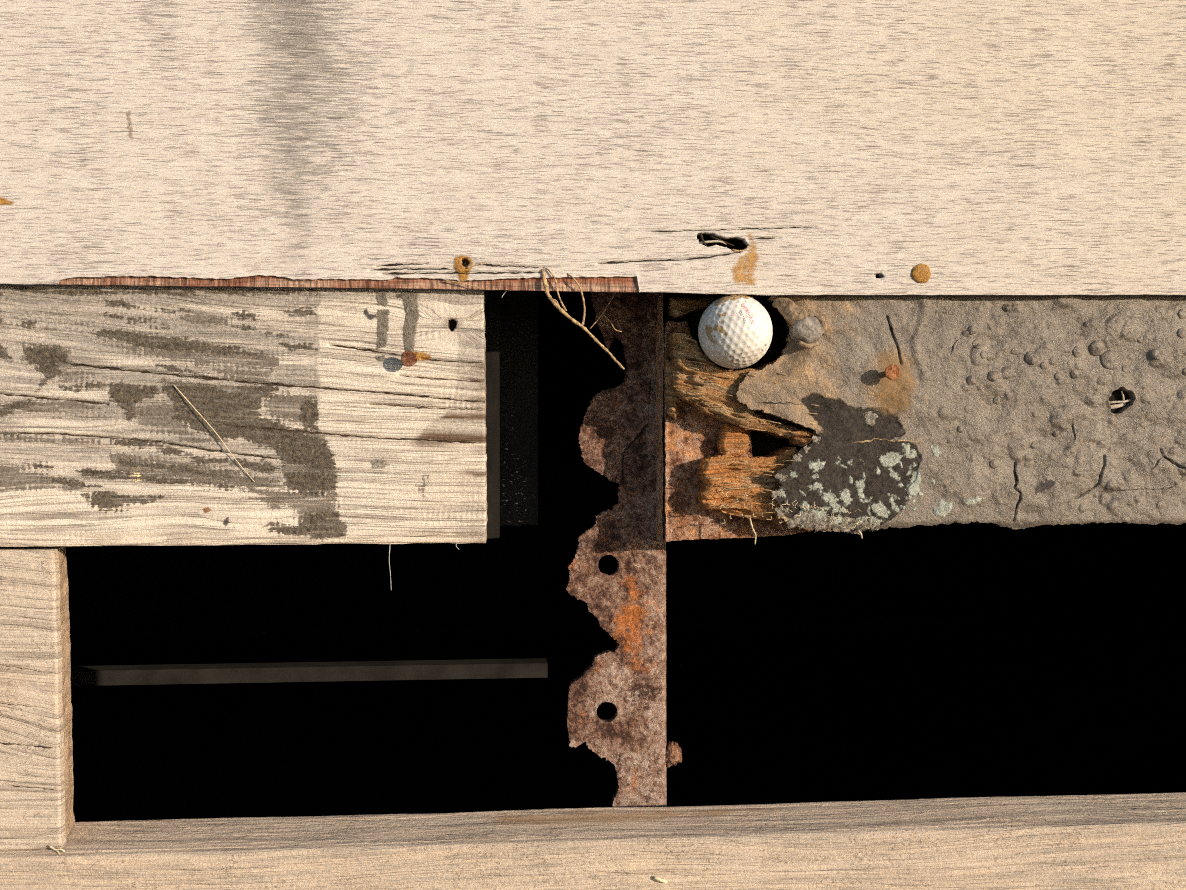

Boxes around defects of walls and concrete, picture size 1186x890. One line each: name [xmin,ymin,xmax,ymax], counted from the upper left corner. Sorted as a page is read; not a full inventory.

crack [597,227,813,264]
corrosion [733,234,758,285]
crack [1013,463,1021,518]
crack [1080,450,1186,496]